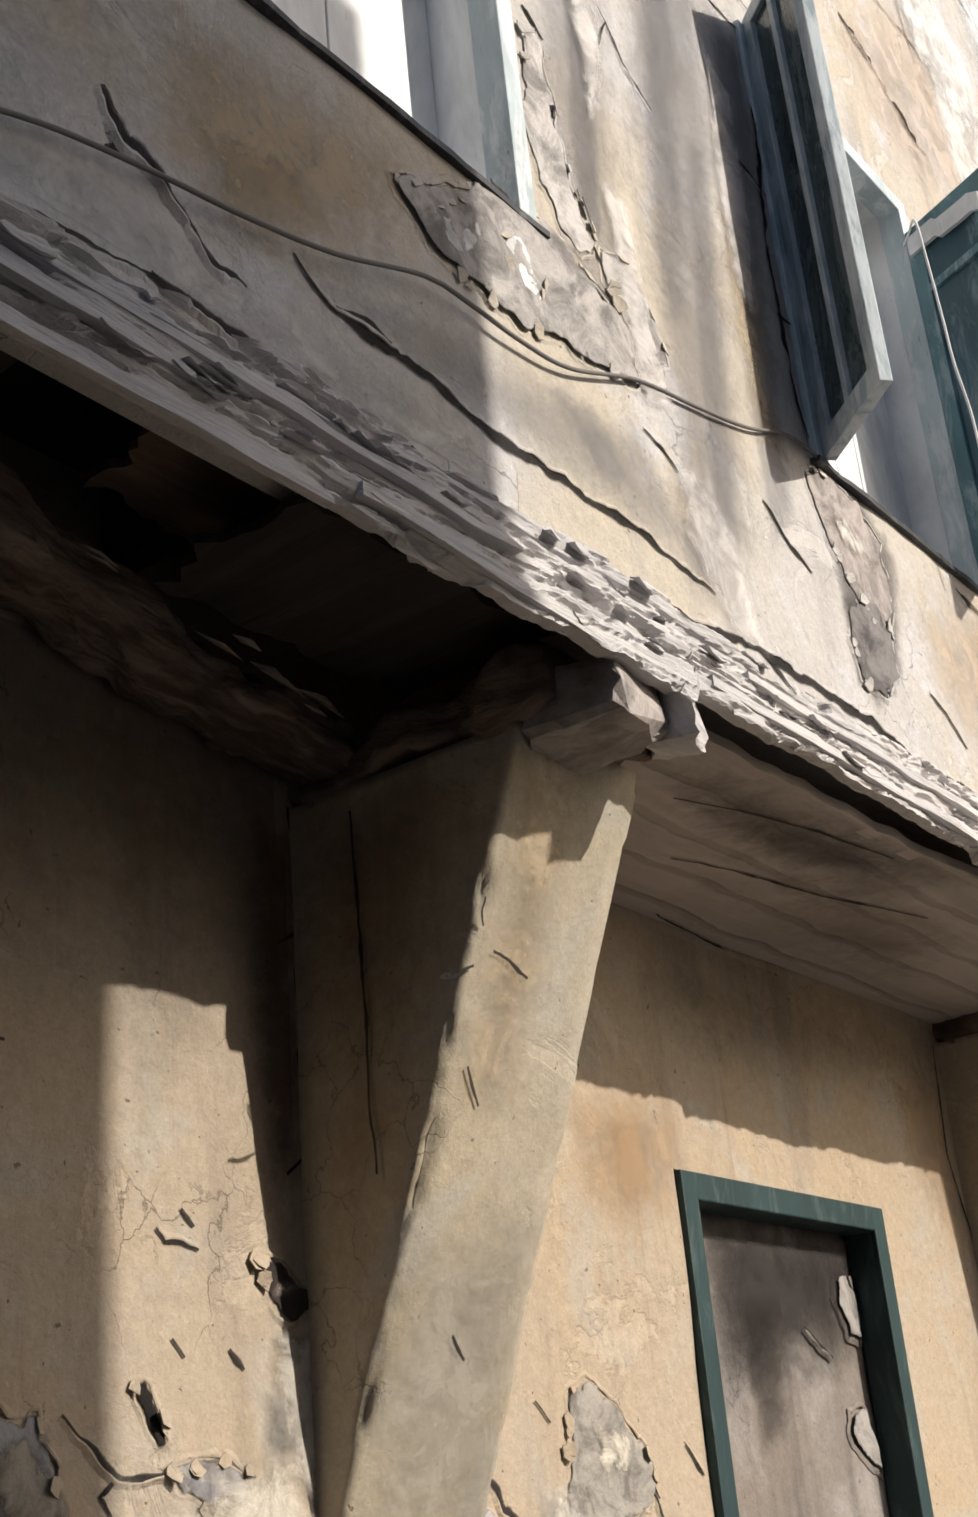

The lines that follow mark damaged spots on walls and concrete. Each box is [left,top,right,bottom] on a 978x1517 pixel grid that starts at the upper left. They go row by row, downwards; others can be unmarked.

crack [33,84,250,347]
flaking render [384,19,672,402]
crack [579,213,603,267]
peeling [708,59,752,301]
crack [710,107,809,438]
peeling [899,0,978,180]
crack [293,251,968,786]
flaking render [798,464,901,706]
flaking render [248,1248,309,1333]
water stain [706,1214,856,1381]
crack [57,1414,257,1517]
flaking render [562,1370,660,1517]